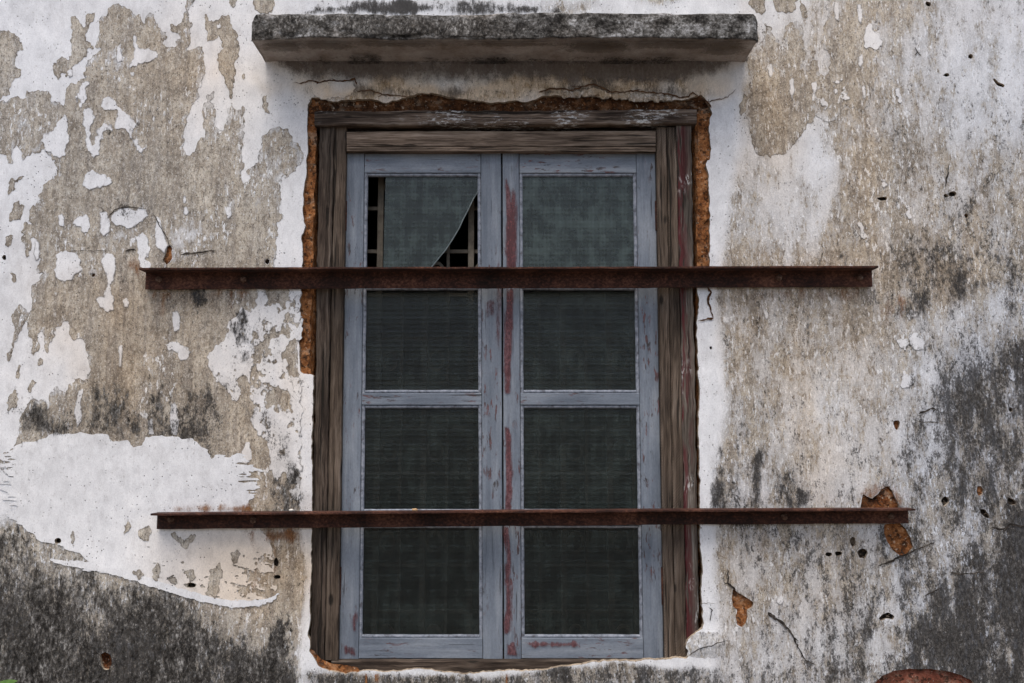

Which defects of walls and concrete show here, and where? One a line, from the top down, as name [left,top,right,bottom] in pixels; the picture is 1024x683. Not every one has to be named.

crack [295,78,406,97]
crack [540,83,735,107]
peeling [739,0,883,158]
peeling [0,0,711,511]
spalling [860,486,898,508]
peeling [124,521,152,541]
peeling [171,532,196,549]
spalling [884,523,912,555]
damp [0,526,296,683]
peeling [132,550,241,599]
peeling [504,526,517,655]
spalling [732,589,753,627]